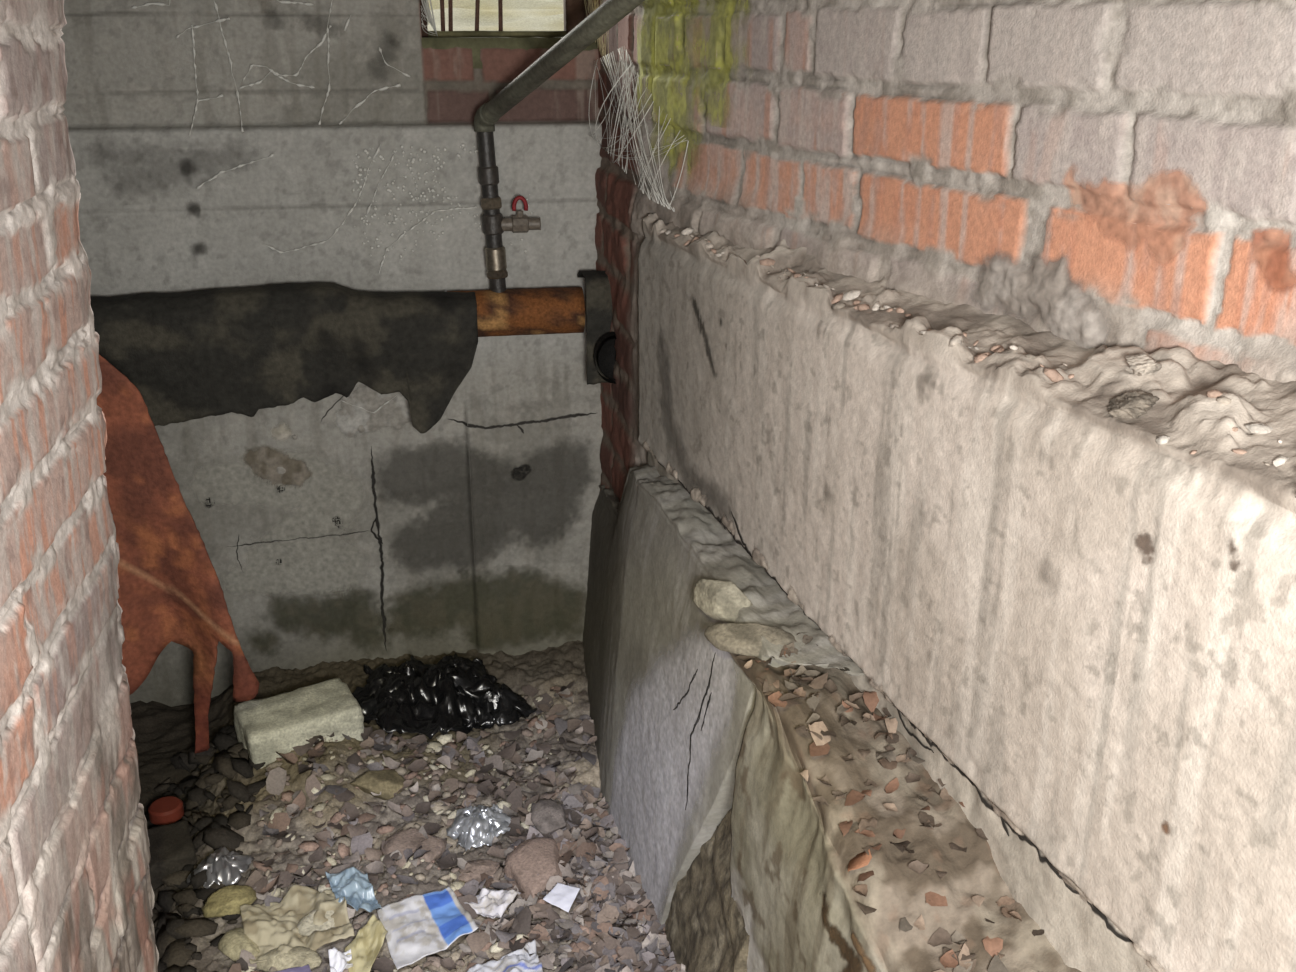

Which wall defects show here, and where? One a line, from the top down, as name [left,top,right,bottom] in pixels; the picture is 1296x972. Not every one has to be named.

damp [693,0,748,124]
spalling [1065,170,1206,265]
spalling [1251,229,1296,290]
spalling [336,386,411,437]
crack [227,447,387,651]
damp [192,446,586,651]
crack [658,462,821,630]
crack [884,693,1135,944]